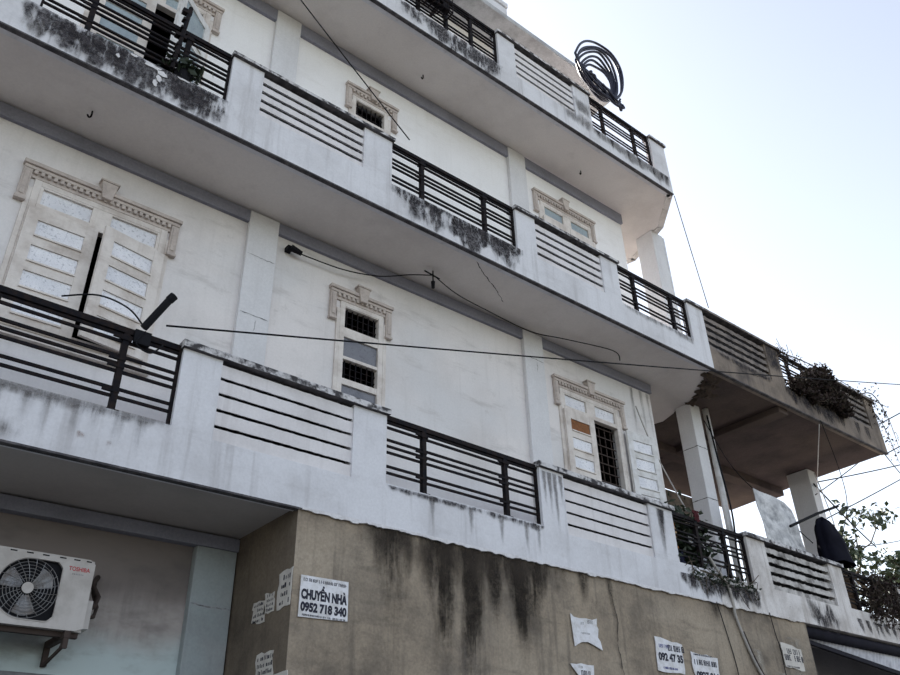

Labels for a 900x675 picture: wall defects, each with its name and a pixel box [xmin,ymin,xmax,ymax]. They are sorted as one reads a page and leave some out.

leakage [24,2,225,120]
leakage [401,1,500,74]
leakage [395,186,521,267]
leakage [390,485,544,530]
leakage [375,527,547,655]
crack [607,581,625,675]
leakage [681,572,761,612]